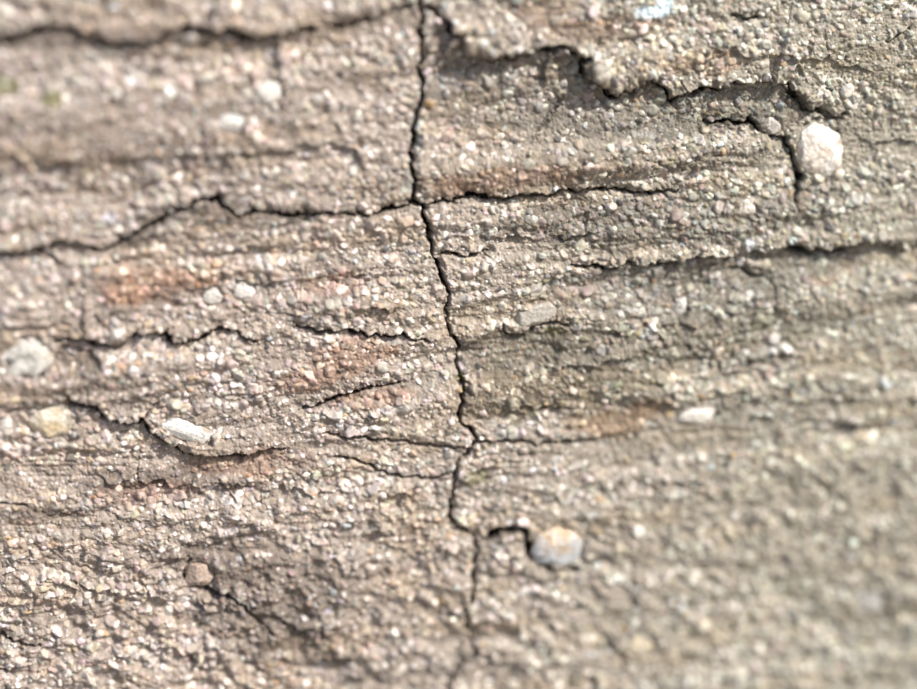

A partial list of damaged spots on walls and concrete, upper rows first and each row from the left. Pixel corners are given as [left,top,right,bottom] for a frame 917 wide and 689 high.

crack [0,25,196,45]
crack [487,46,744,101]
crack [784,83,819,110]
crack [702,117,797,203]
crack [1,220,156,255]
crack [787,243,860,252]
crack [62,327,256,347]
crack [179,0,568,651]
crack [73,402,281,457]